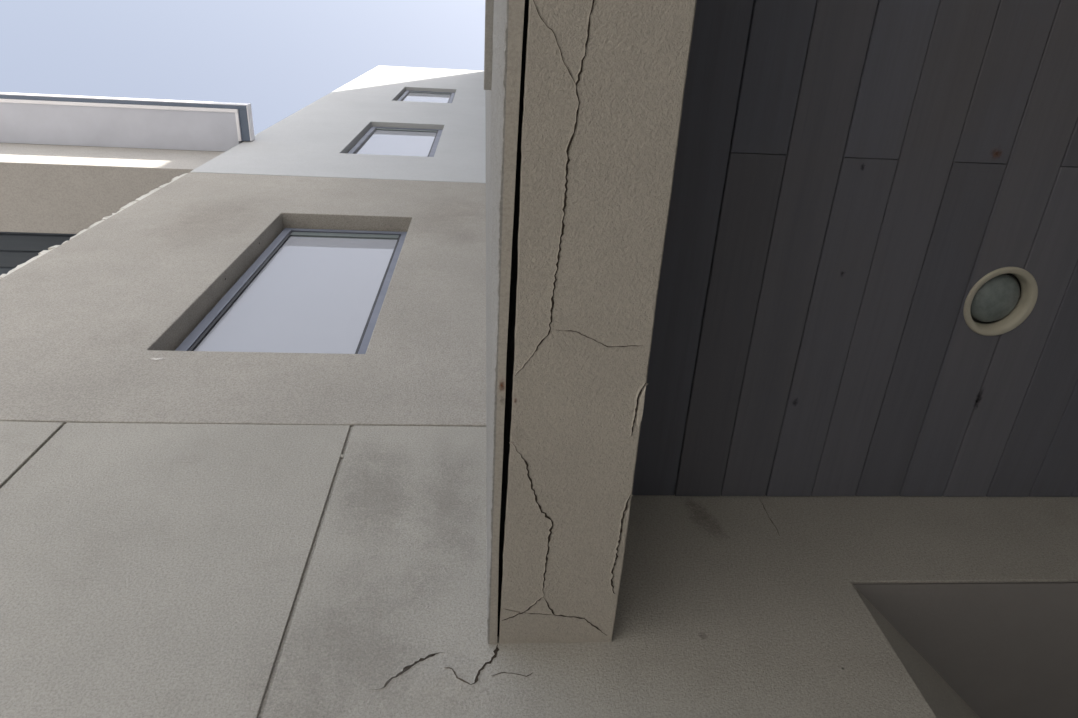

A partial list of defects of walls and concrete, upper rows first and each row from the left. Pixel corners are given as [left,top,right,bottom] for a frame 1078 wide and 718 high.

crack [369,0,643,691]
crack [630,382,648,437]